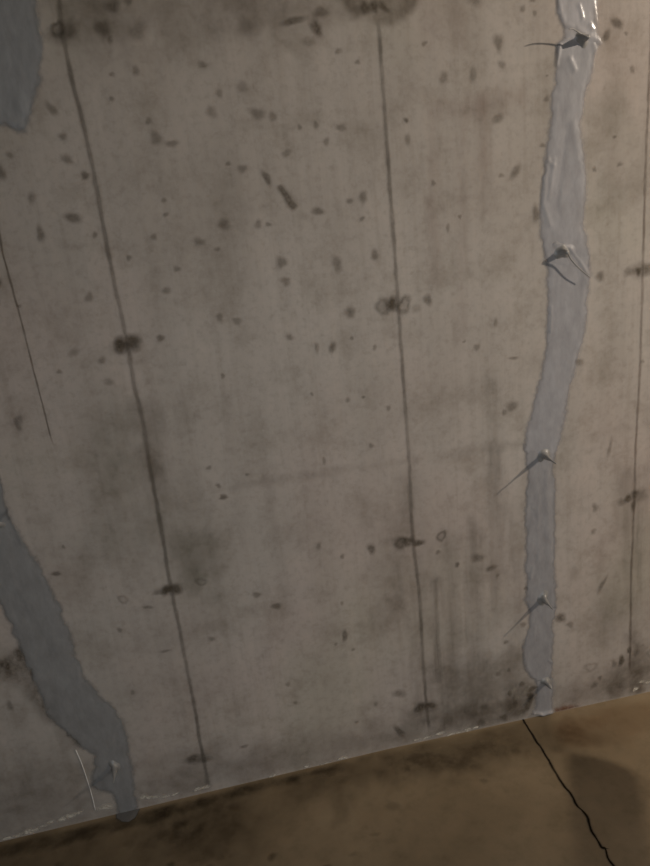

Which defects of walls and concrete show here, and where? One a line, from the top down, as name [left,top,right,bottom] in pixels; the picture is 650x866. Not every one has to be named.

crack [0,0,43,131]
crack [522,0,615,866]
crack [0,483,139,822]